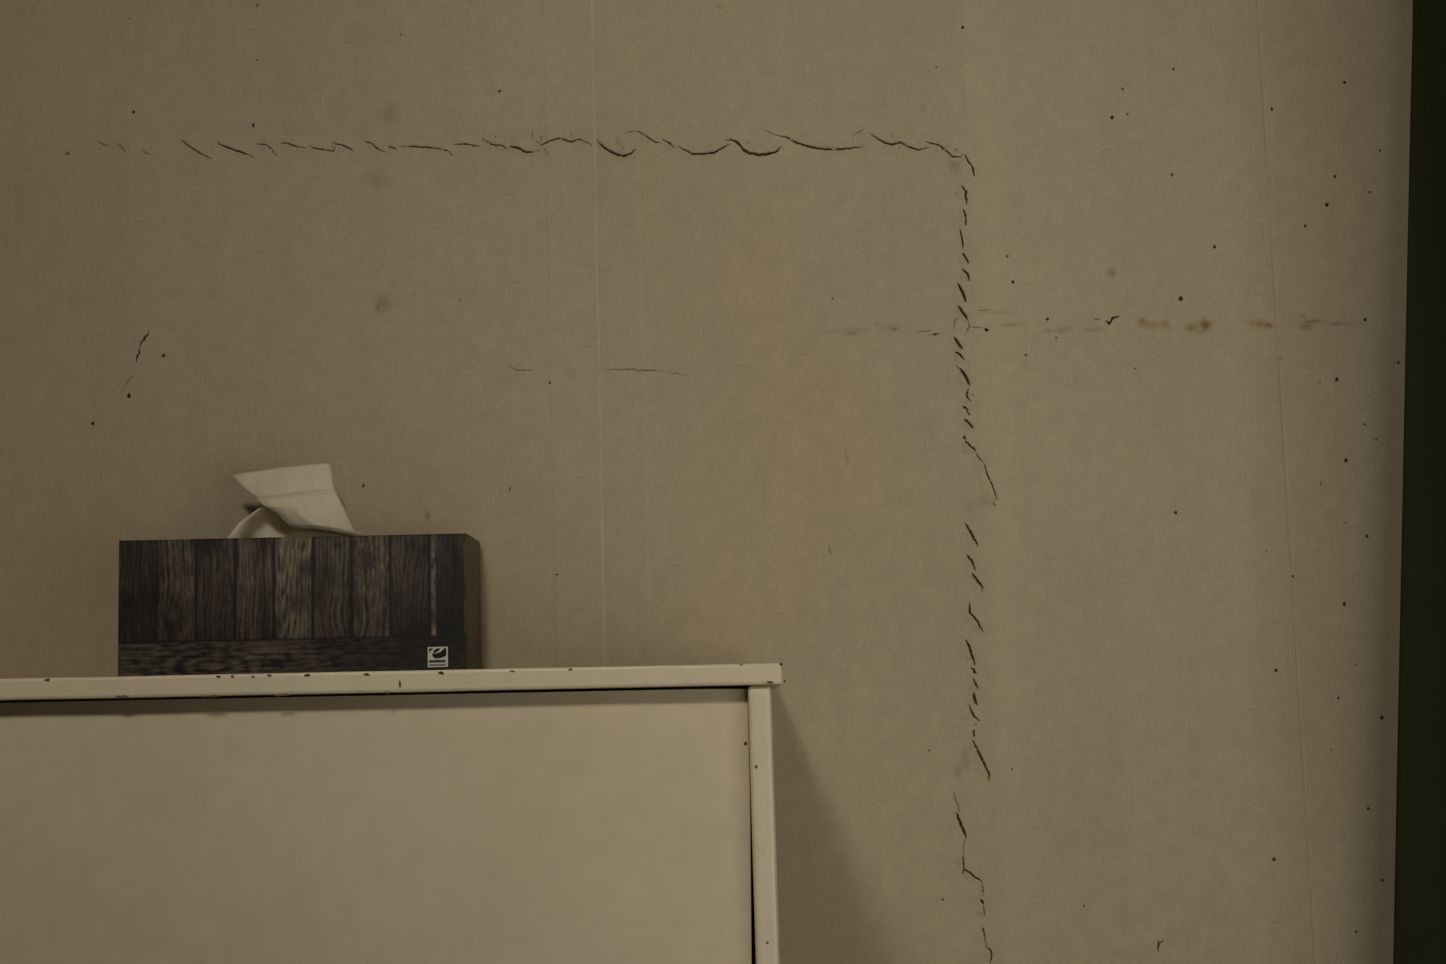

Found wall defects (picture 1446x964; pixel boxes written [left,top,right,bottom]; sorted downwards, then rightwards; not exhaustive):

crack [65,125,1000,964]